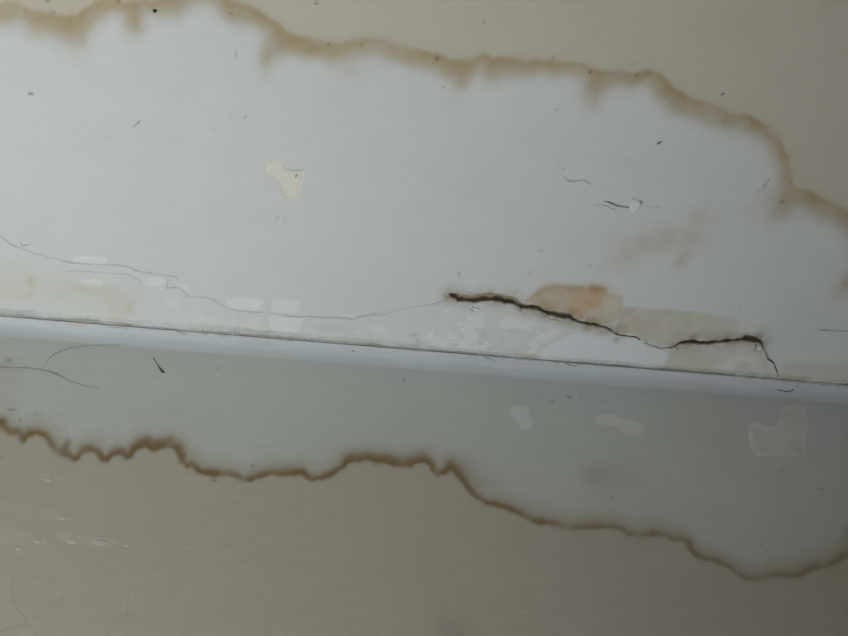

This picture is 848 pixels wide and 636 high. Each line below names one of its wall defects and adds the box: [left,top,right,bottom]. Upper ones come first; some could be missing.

crack [223,295,305,321]
damp [0,0,848,370]
crack [434,279,799,392]
damp [0,337,848,585]